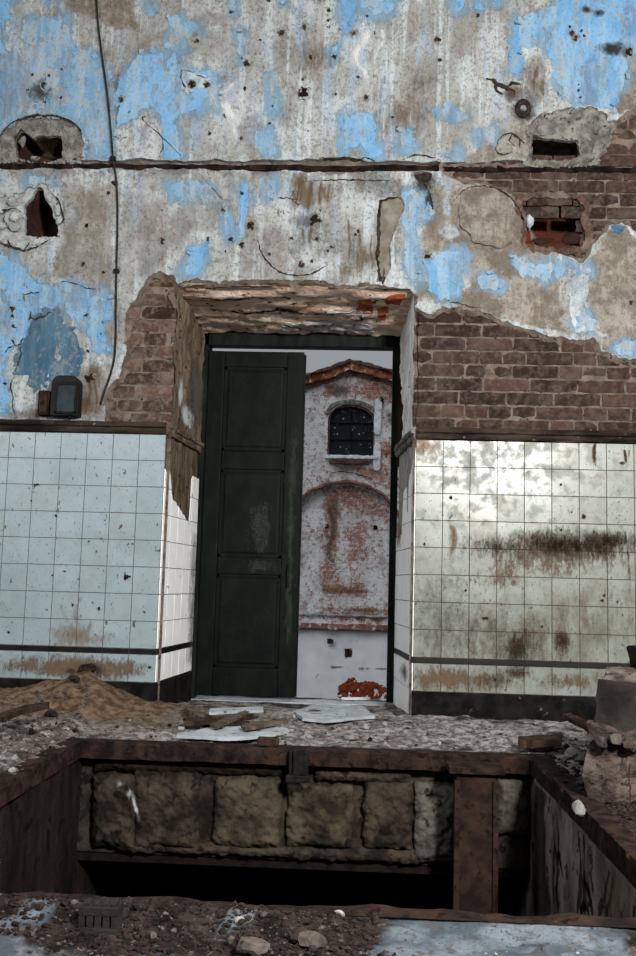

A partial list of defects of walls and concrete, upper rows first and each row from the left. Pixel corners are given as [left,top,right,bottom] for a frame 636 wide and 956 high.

flaking render [0,0,636,523]
spalling [384,439,416,538]
rust [472,530,636,585]